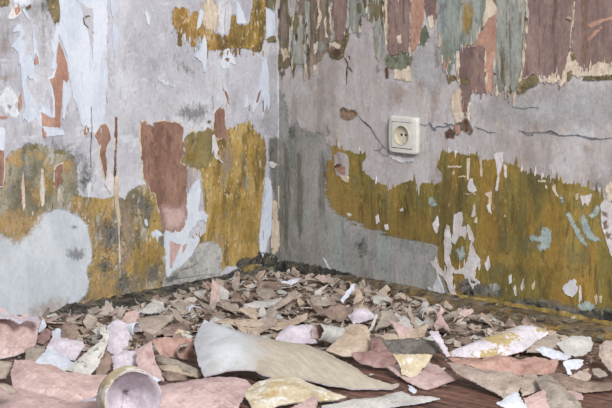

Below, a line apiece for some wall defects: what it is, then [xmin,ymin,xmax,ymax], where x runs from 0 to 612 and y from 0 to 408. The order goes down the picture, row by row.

peeling [217,0,247,36]
peeling [265,0,279,57]
peeling [316,0,349,60]
peeling [382,0,437,70]
peeling [457,41,488,116]
peeling [518,0,612,90]
crack [521,130,609,140]
peeling [139,120,202,243]
leakage [228,91,449,293]
peeling [466,158,477,195]
peeling [485,152,507,215]
flaking render [0,168,612,408]